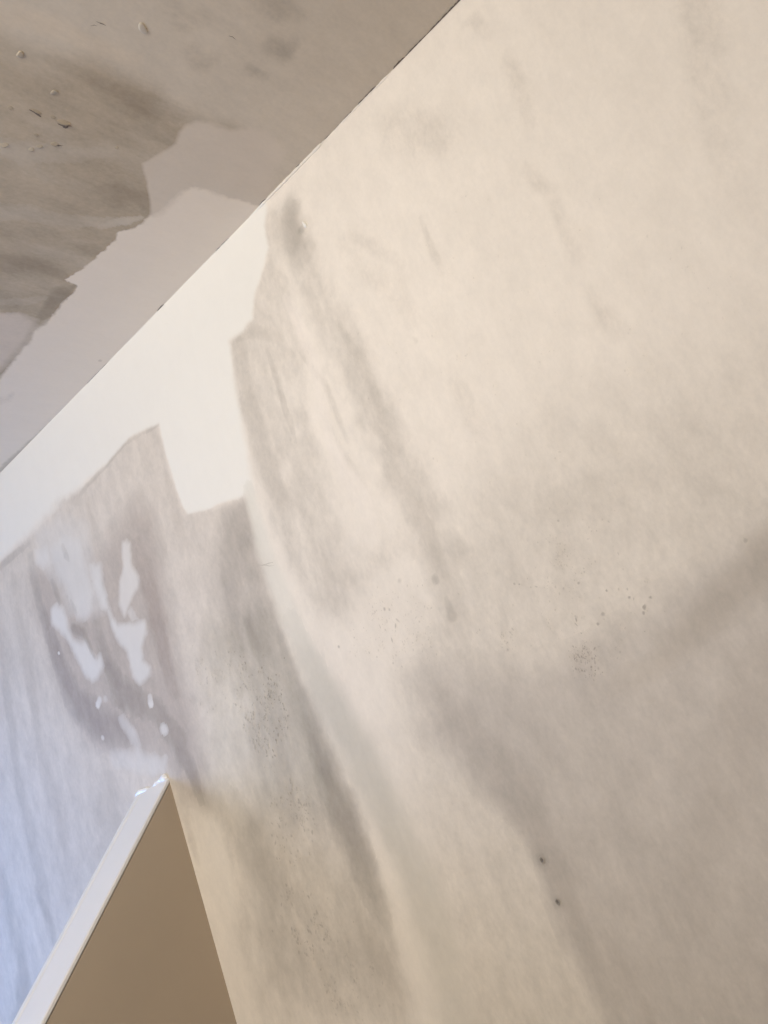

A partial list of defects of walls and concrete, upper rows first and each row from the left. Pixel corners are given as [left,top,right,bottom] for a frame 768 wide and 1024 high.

damp [0,0,247,328]
peeling [33,510,153,687]
damp [0,489,216,1024]
damp [52,185,768,1024]